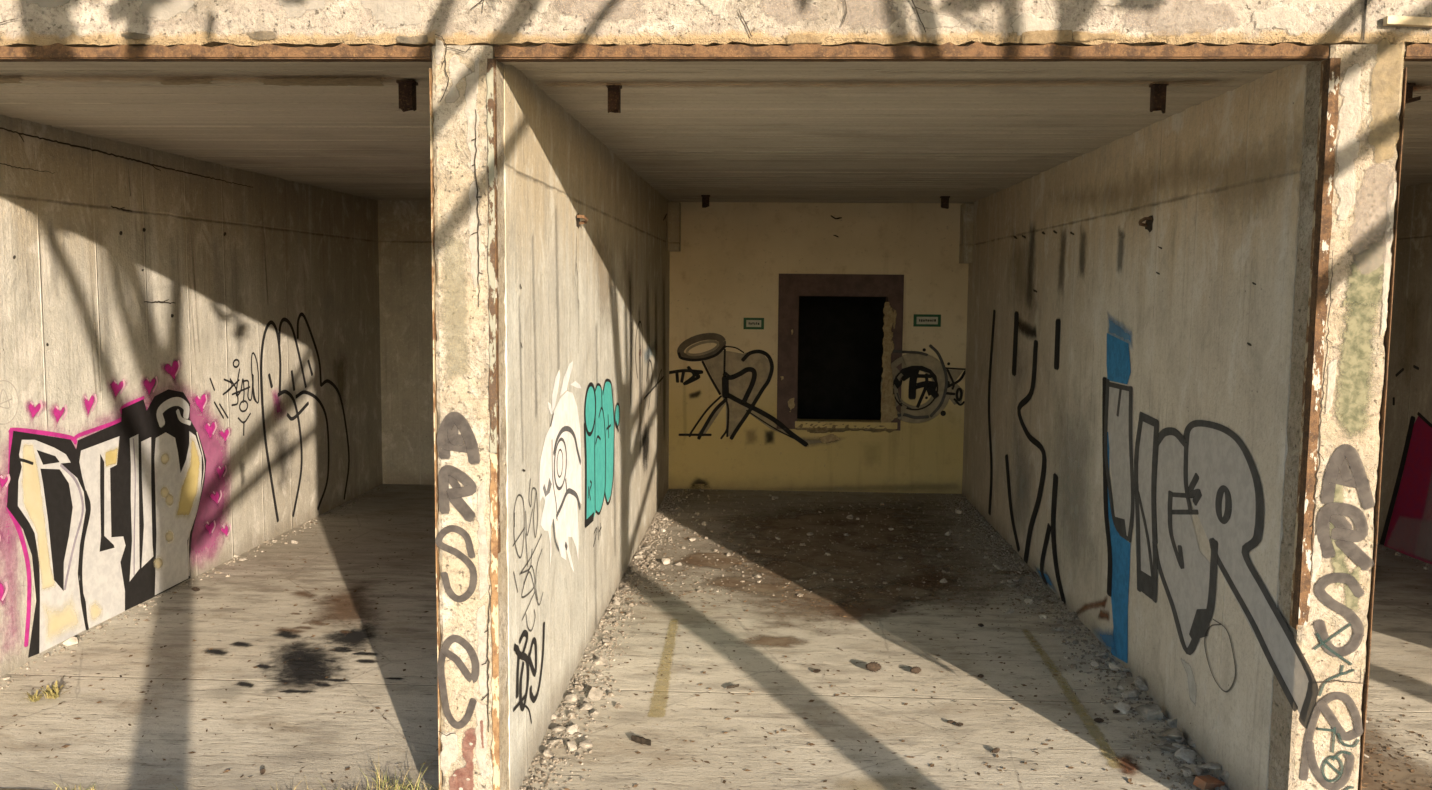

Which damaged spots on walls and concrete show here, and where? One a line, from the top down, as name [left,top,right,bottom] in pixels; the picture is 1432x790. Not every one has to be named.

spalling [247,31,276,40]
peeling [396,35,482,289]
water stain [1335,233,1386,437]
peeling [440,482,489,790]